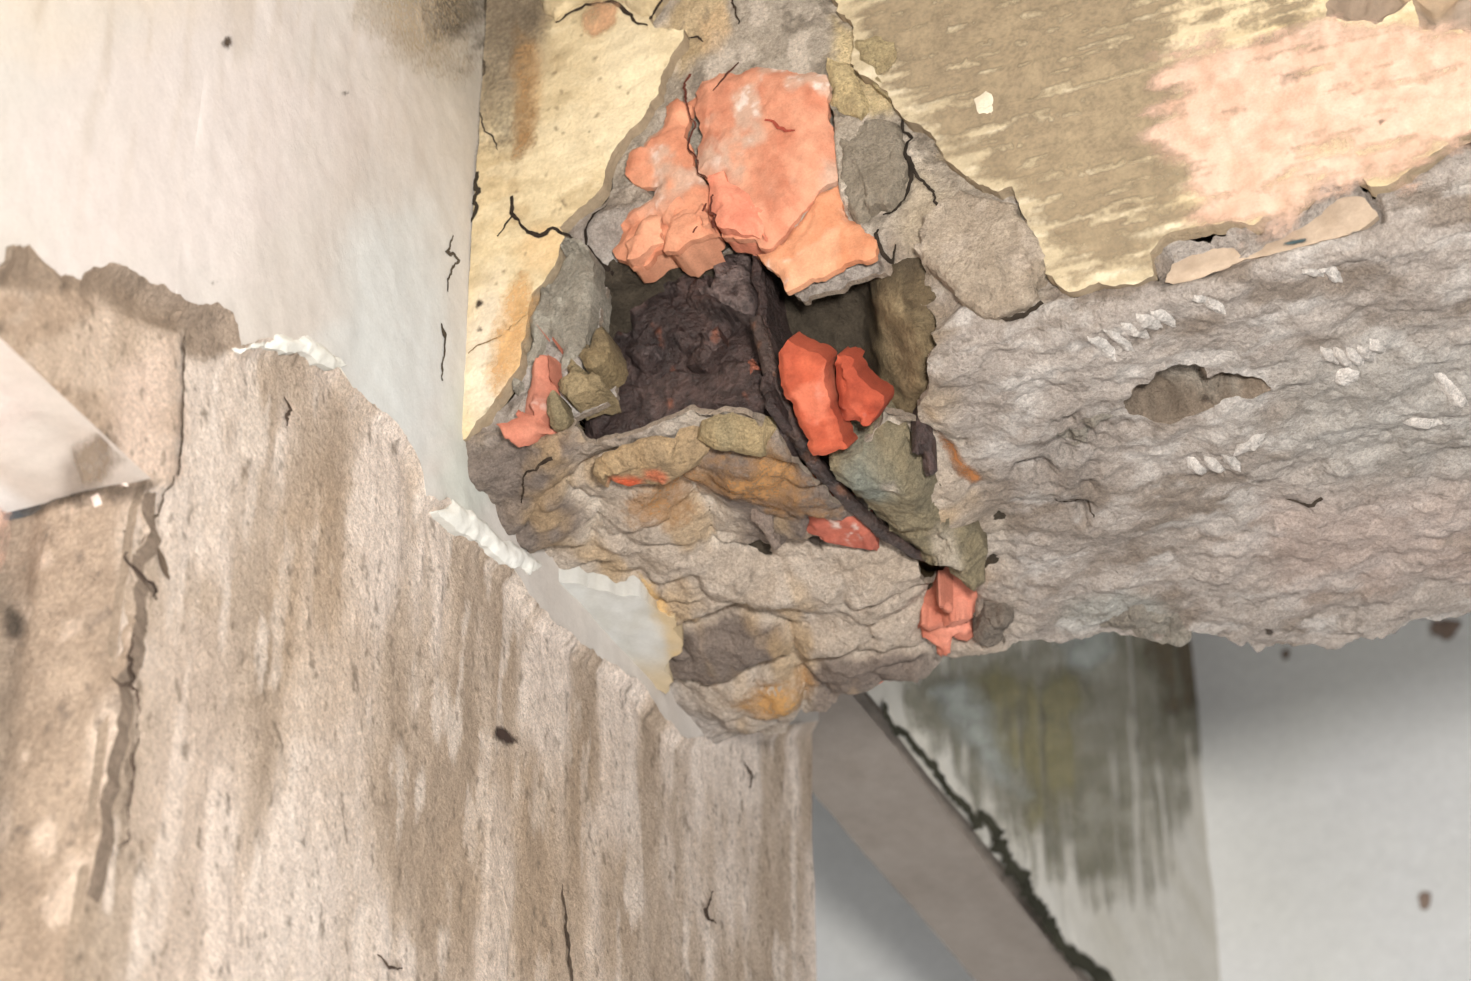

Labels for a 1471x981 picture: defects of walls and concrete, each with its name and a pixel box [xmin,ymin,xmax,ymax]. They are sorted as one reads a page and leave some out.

leakage [382,0,545,157]
crack [441,113,614,381]
peeling [540,0,596,21]
crack [555,0,663,26]
crack [874,117,938,264]
leakage [857,0,1197,282]
leakage [1202,8,1225,21]
leakage [1239,0,1313,42]
spalling [567,0,1471,659]
crack [123,335,186,600]
spalling [0,244,1002,981]
peeling [1418,891,1431,910]